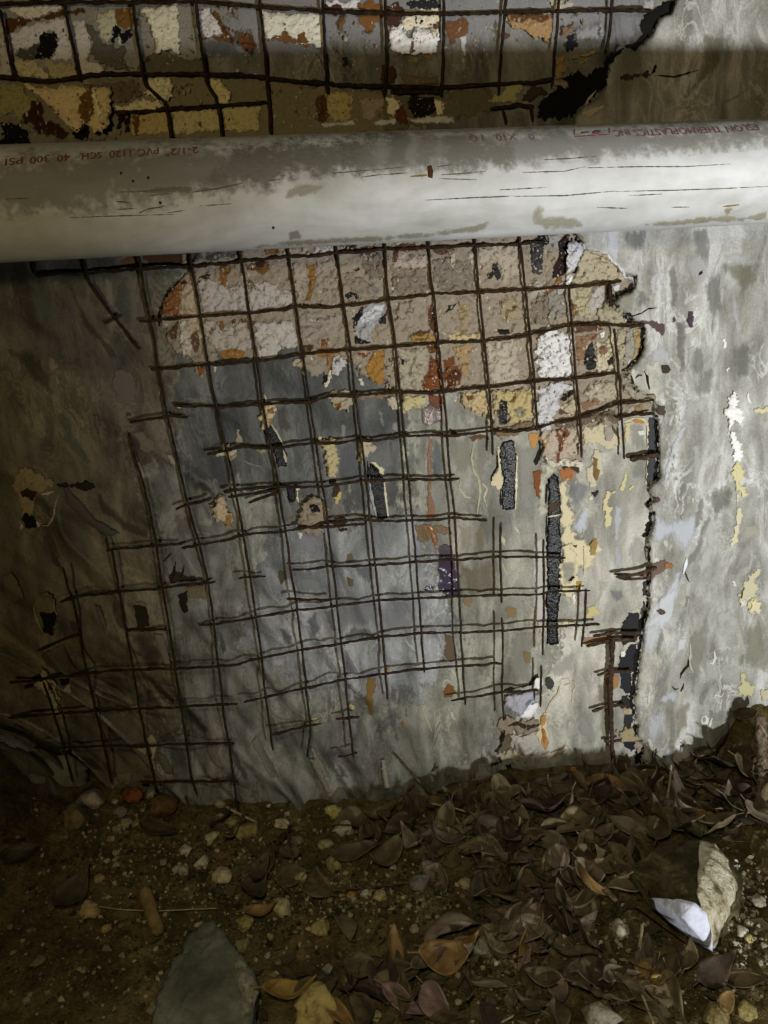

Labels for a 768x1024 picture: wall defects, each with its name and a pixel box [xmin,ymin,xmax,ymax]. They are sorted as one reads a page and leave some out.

peeling [24,3,231,141]
peeling [262,10,323,48]
peeling [389,0,440,55]
spalling [530,233,624,322]
corrosion [410,305,462,557]
corrosion [533,470,560,511]
corrosion [529,429,579,481]
corrosion [444,634,456,662]
peeling [490,674,554,766]
corrosion [508,715,549,749]
corrosion [584,631,641,763]
spalling [616,567,657,753]